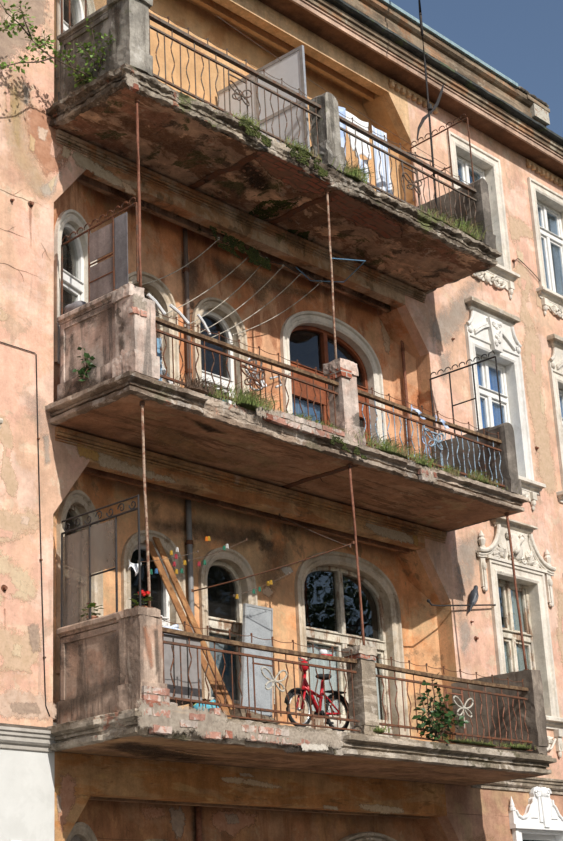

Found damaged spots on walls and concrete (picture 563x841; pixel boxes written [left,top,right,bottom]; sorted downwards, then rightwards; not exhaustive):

flaking render [25,106,136,195]
peeling [0,415,18,497]
flaking render [256,404,353,442]
peeling [0,508,40,605]
leakage [109,743,204,761]
flaking render [137,685,341,753]
peeling [57,773,76,831]